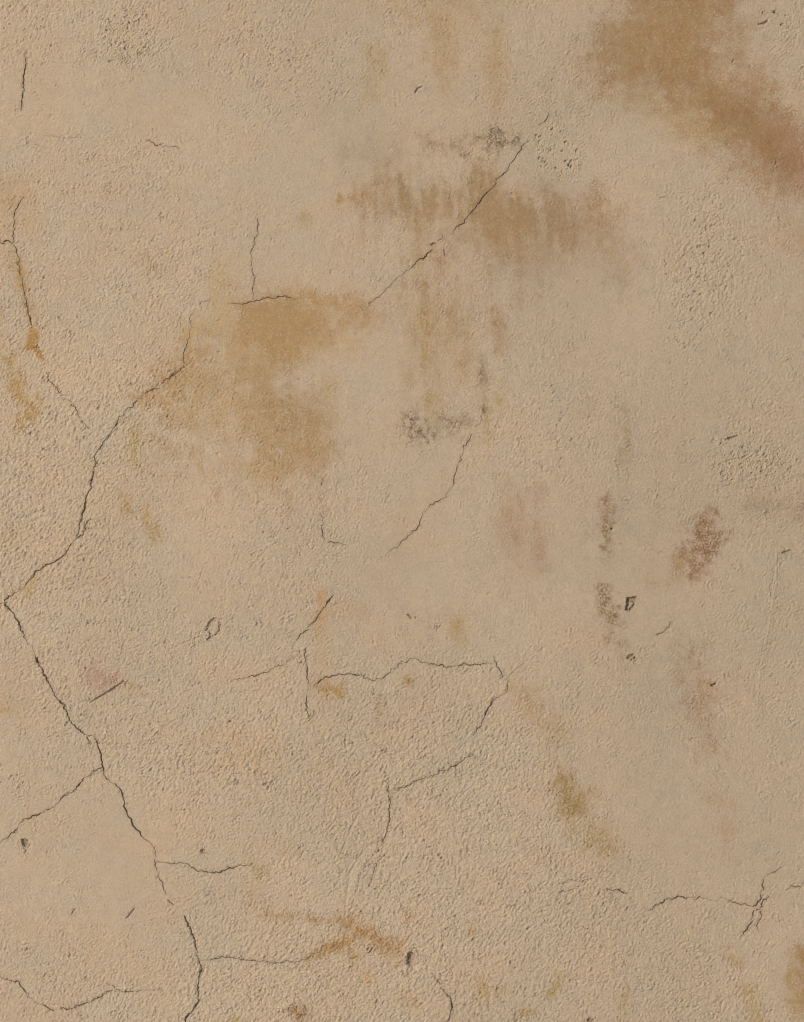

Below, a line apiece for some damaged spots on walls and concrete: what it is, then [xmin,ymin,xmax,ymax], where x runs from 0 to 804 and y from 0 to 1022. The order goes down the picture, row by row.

crack [0,196,33,328]
leakage [122,0,648,520]
crack [369,112,551,305]
leakage [564,0,804,269]
crack [0,216,317,1022]
crack [234,595,524,887]